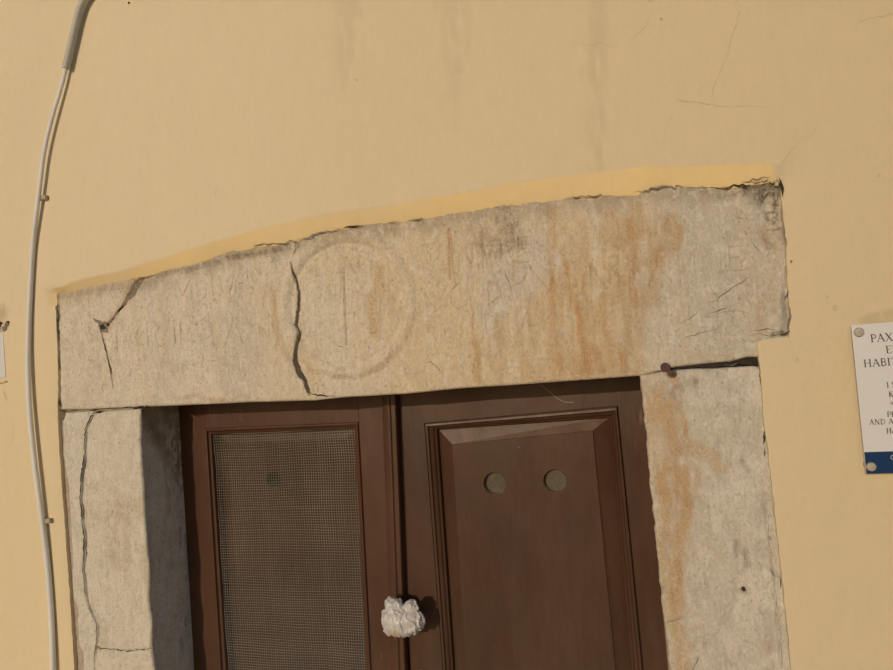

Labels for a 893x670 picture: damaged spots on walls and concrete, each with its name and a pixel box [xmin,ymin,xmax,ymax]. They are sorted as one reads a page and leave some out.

crack [253,225,362,397]
crack [79,411,153,656]